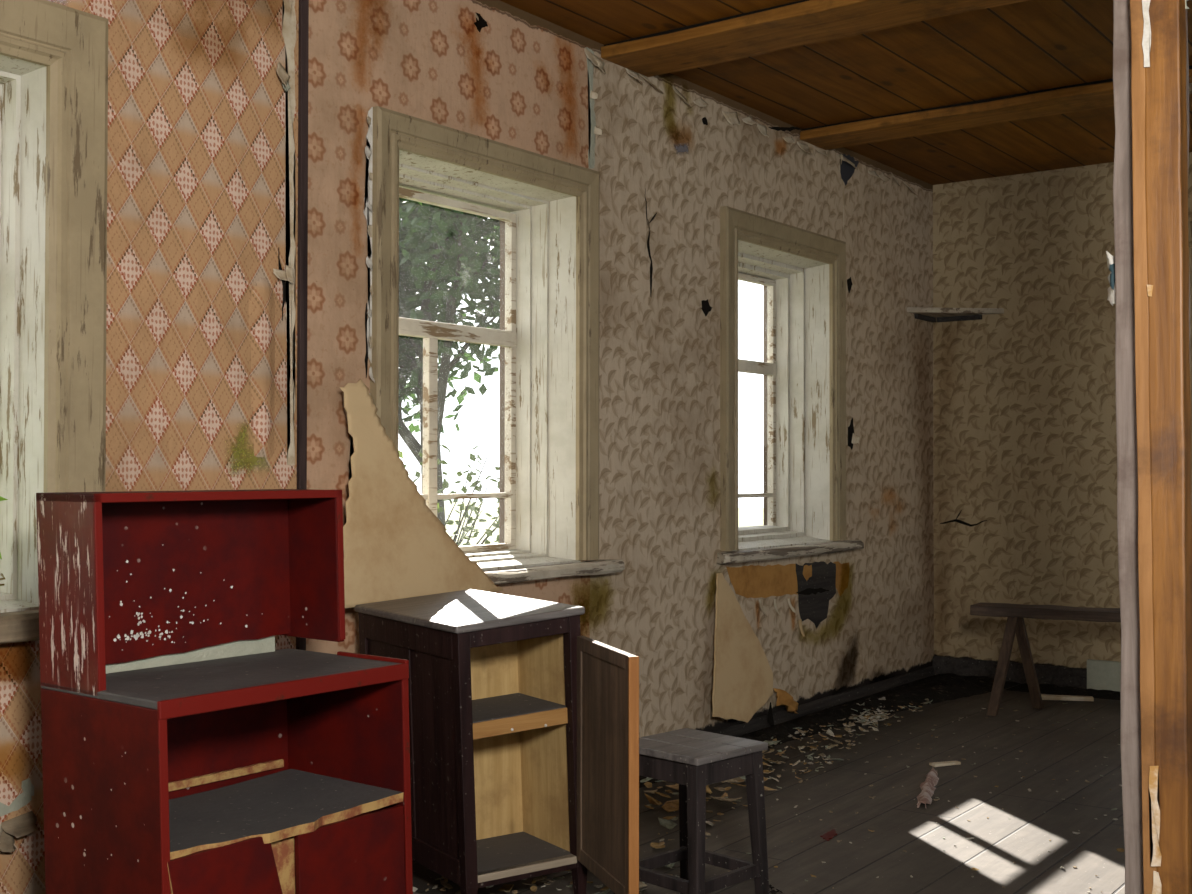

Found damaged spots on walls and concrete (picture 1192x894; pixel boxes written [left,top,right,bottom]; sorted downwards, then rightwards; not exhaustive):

crack [645,188,657,296]
peeling [343,393,354,523]
spalling [726,561,850,637]